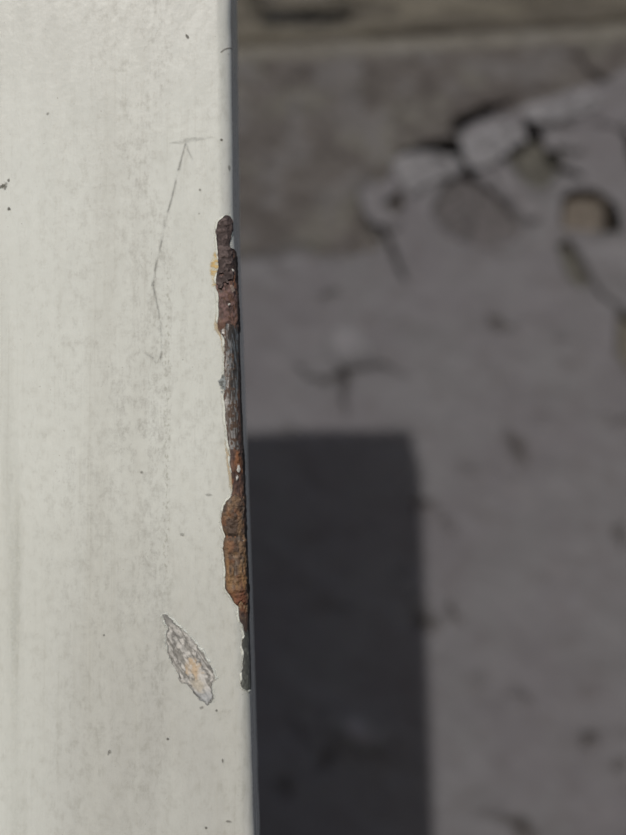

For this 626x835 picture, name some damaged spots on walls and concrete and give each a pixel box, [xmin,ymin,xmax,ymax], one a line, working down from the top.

peeling [161,614,218,705]
rust [211,215,251,693]